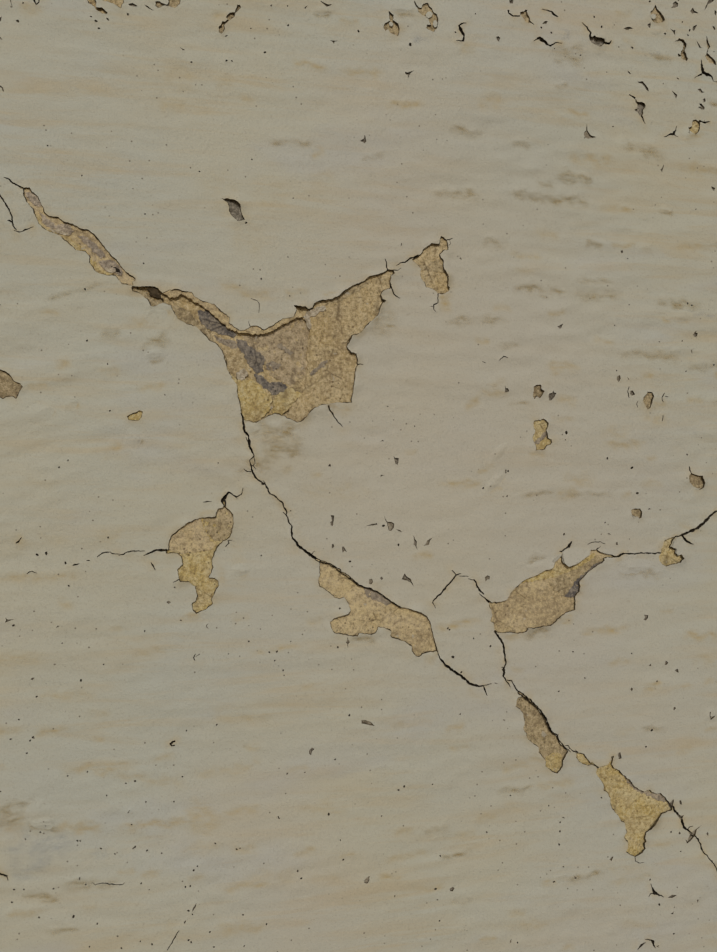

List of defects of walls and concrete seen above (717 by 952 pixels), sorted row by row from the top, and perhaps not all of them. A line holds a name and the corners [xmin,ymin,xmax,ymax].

crack [0,177,32,232]
peeling [20,187,395,423]
peeling [408,236,450,294]
peeling [166,502,234,614]
crack [205,413,401,608]
peeling [316,559,437,657]
crack [432,570,489,606]
peeling [487,533,620,634]
crack [559,511,717,557]
crack [437,630,599,768]
peeling [516,692,684,857]
crack [673,806,717,871]